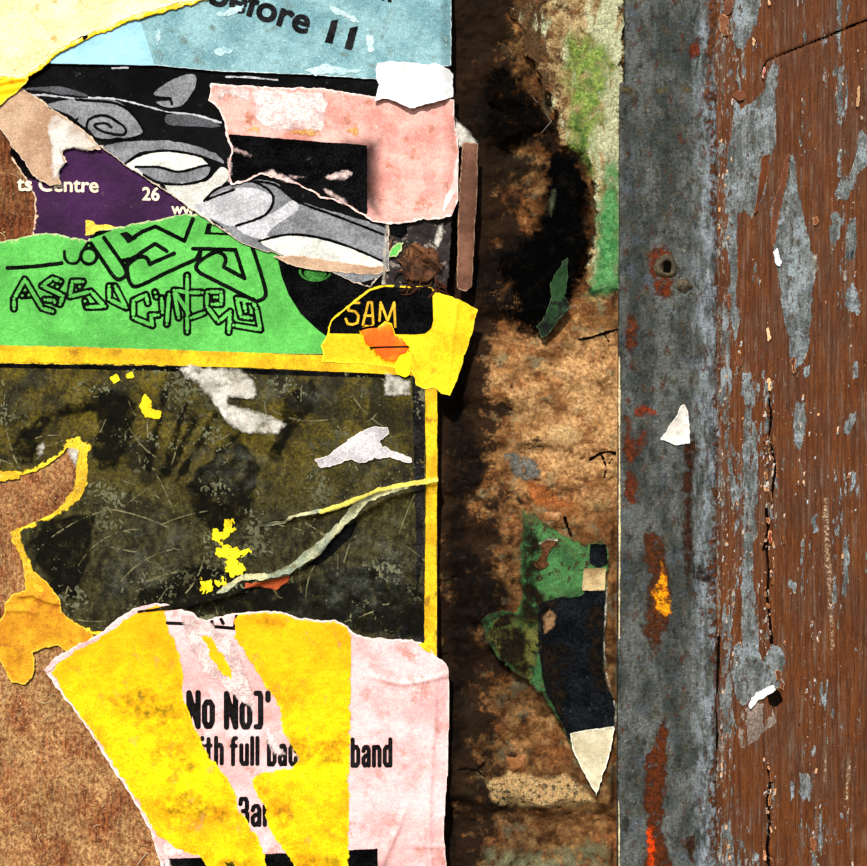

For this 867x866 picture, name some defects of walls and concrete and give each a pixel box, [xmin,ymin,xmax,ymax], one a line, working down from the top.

corrosion [649,247,673,298]
corrosion [626,315,638,352]
corrosion [623,406,656,504]
peeling [717,60,867,748]
crack [762,396,786,646]
corrosion [642,533,672,645]
corrosion [682,394,721,866]
corrosion [644,722,672,866]
crack [763,764,774,866]